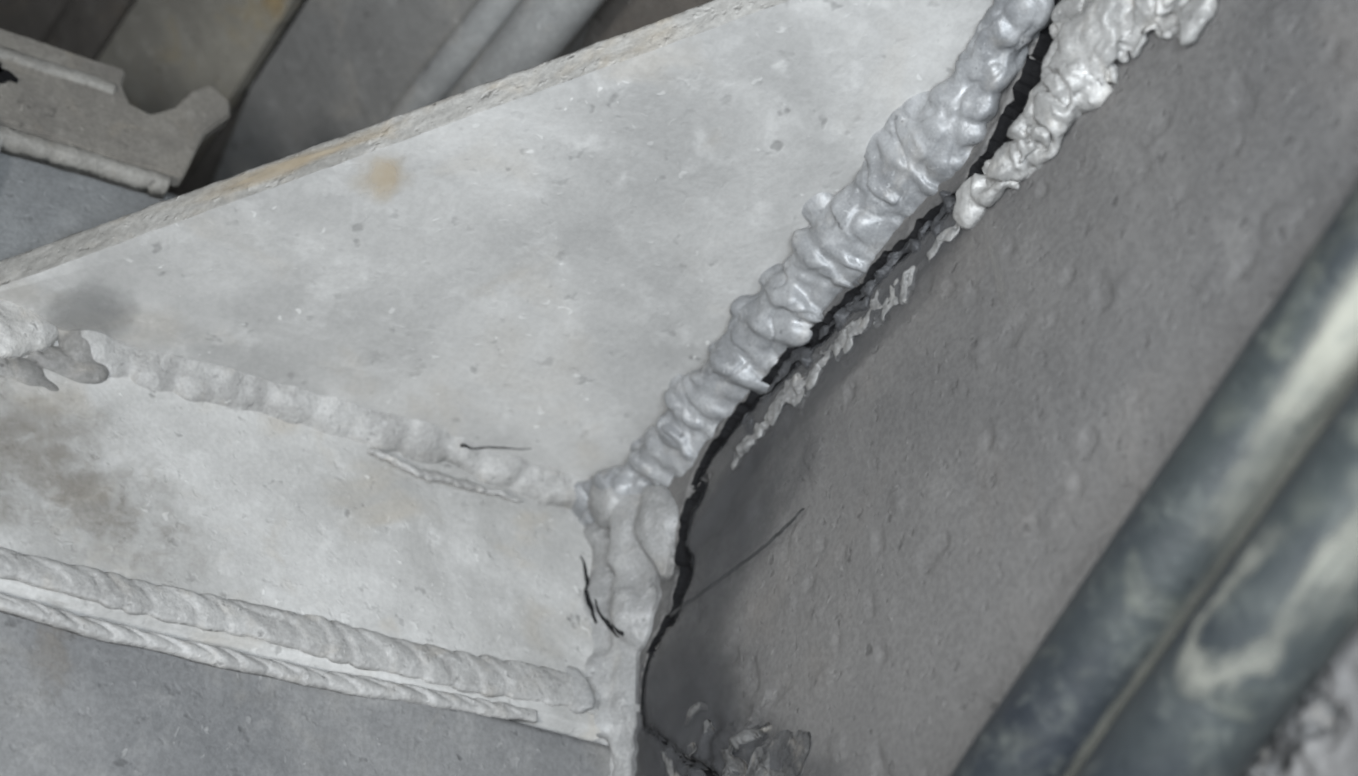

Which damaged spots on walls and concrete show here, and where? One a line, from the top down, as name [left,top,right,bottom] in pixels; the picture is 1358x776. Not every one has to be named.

crack [580,0,1061,776]